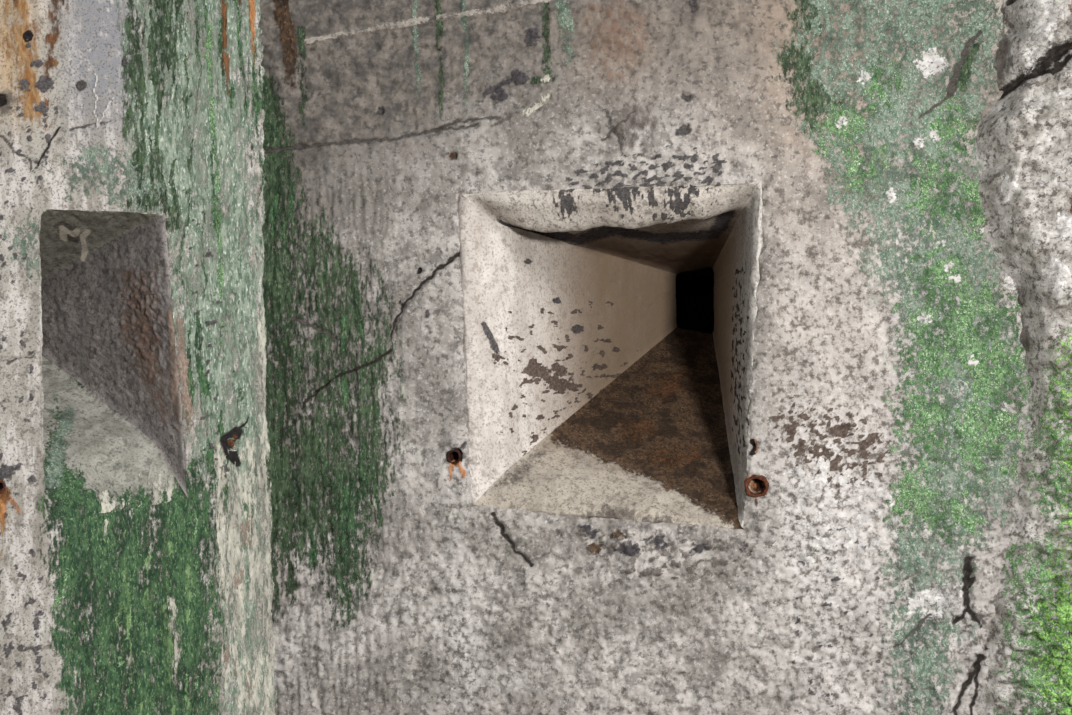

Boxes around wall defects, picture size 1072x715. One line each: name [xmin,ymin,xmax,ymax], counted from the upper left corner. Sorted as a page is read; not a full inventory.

corrosion [0,0,69,131]
crack [998,38,1072,101]
leakage [1019,0,1068,74]
crack [0,73,114,189]
leakage [44,0,389,715]
crack [302,252,460,409]
leakage [772,0,1031,715]
leakage [1041,253,1072,296]
corrosion [0,488,20,535]
corrosion [449,460,466,480]
crack [491,512,534,567]
crack [893,556,989,715]